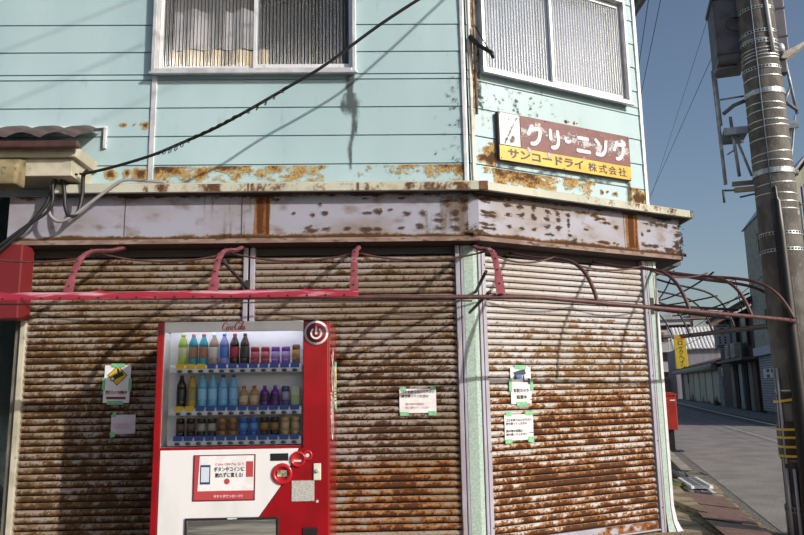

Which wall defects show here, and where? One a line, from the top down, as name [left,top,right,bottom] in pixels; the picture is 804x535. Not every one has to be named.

water stain [341,75,358,169]
rust [15,181,687,257]
rust [14,258,242,535]
rust [273,256,464,535]
rust [487,318,659,535]